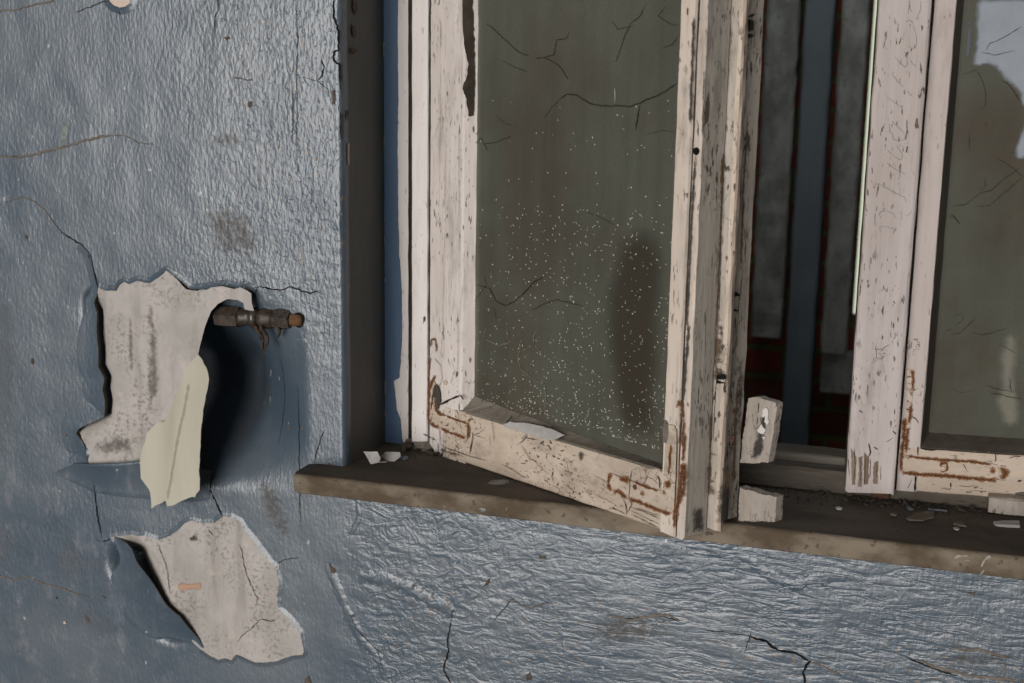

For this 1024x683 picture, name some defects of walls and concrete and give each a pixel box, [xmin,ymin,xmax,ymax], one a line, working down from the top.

crack [0,135,154,159]
crack [7,196,98,286]
crack [254,286,320,294]
peeling [53,243,257,509]
peeling [109,512,308,667]
crack [443,612,452,682]
crack [711,631,841,683]